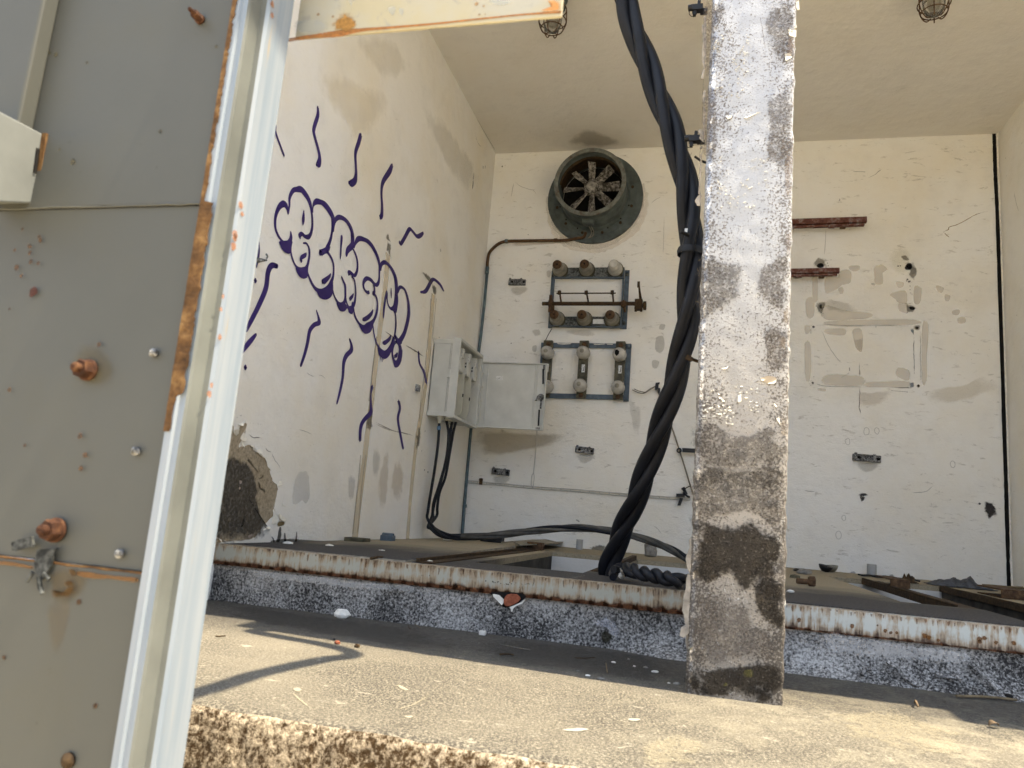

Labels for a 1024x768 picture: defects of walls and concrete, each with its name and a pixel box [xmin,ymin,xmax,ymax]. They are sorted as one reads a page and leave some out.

rust [288,1,562,42]
rust [163,0,237,431]
peeling [215,421,287,544]
rust [53,569,139,605]
rust [213,546,684,615]
water stain [686,423,786,702]
rust [785,605,1024,654]